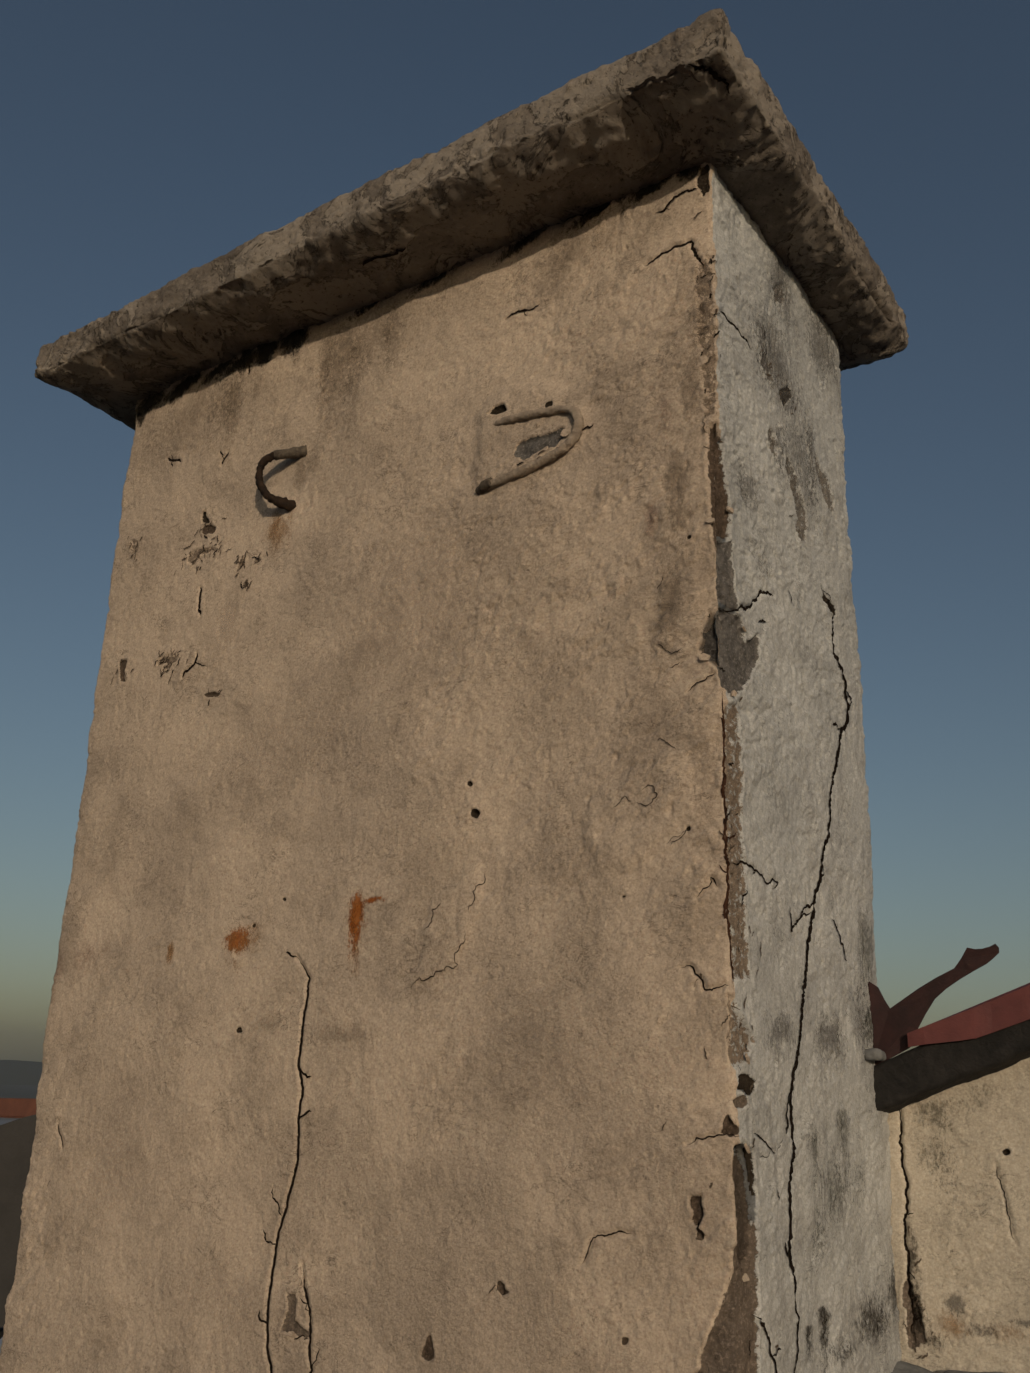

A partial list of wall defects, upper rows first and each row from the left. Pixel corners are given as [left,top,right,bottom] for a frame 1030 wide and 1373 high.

crack [646,240,704,268]
water stain [136,328,309,424]
spalling [514,423,594,465]
spalling [695,252,762,980]
corrosion [225,926,251,953]
corrosion [348,893,384,955]
crack [682,588,852,1373]
crack [258,951,320,1373]
spalling [690,1182,713,1240]
spalling [699,997,759,1373]
crack [898,1110,916,1336]
spalling [282,1294,310,1338]